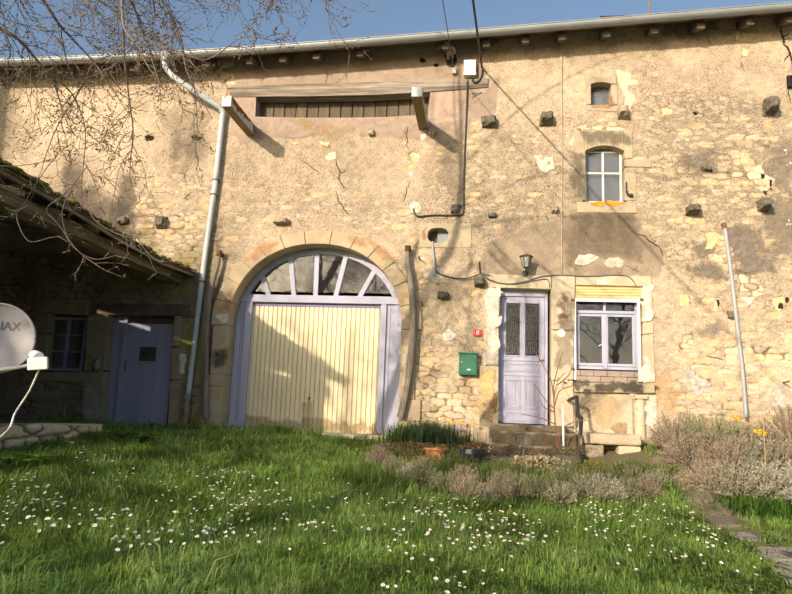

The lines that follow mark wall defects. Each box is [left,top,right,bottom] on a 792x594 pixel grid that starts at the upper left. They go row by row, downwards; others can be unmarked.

crack [780,27,792,64]
crack [335,159,349,215]
damp [728,144,792,274]
damp [568,213,635,262]